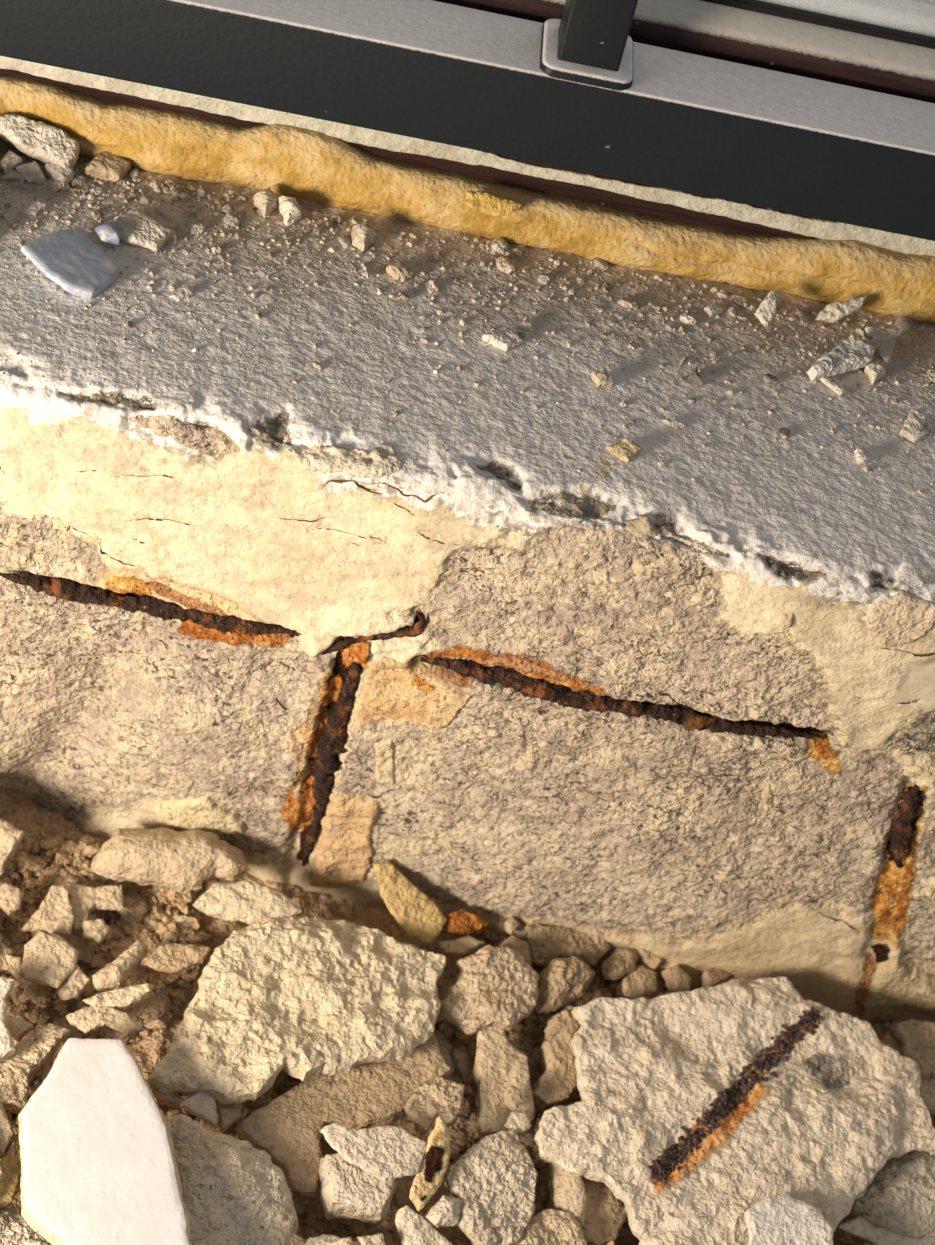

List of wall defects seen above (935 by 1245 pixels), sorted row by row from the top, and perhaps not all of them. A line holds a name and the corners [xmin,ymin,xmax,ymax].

spalling [68,390,240,461]
peeling [248,412,403,479]
spalling [0,503,299,637]
rust [94,567,296,647]
rust [280,636,619,864]
spalling [302,462,935,1009]
rust [643,701,713,717]
rust [733,720,841,774]
peeling [153,794,247,834]
rust [854,784,928,1016]